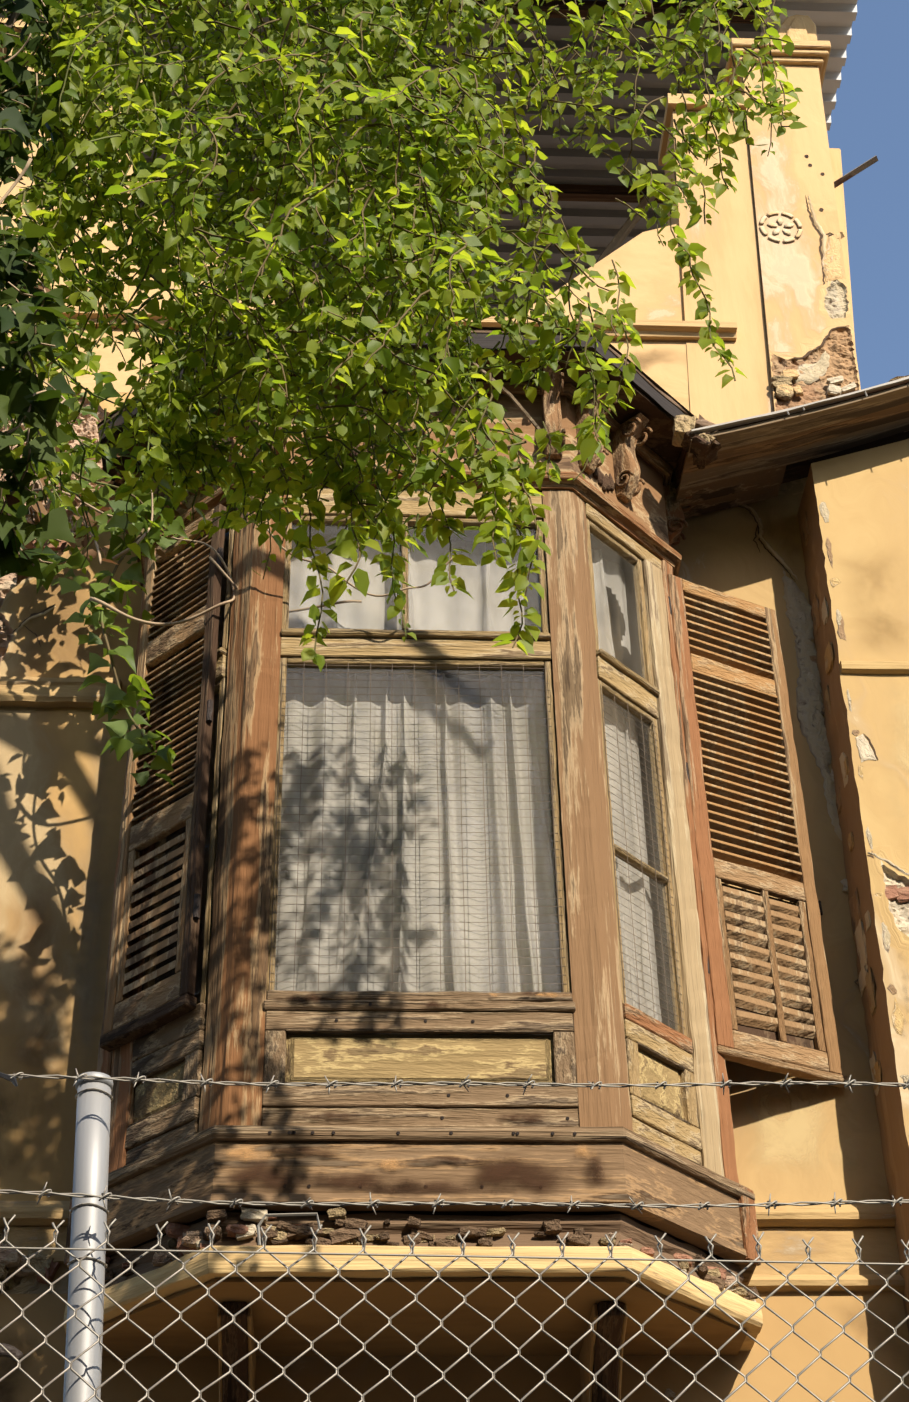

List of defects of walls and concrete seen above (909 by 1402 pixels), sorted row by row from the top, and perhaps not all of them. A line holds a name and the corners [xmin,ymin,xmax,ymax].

spalling [770,233,860,411]
spalling [0,418,28,458]
spalling [8,392,110,556]
spalling [0,572,28,663]
peeling [781,502,909,1035]